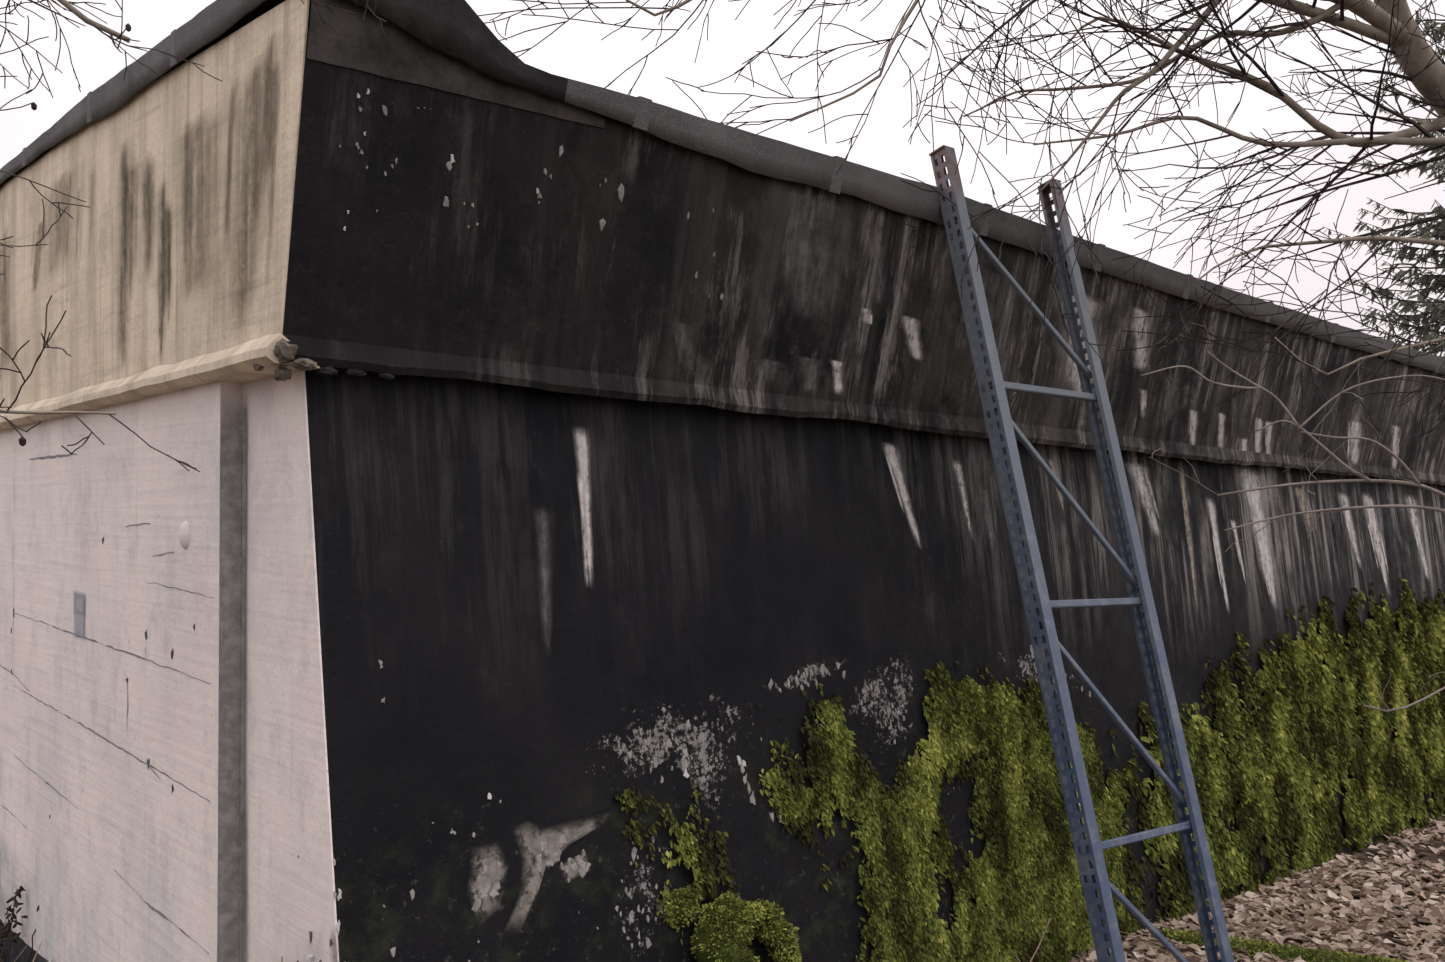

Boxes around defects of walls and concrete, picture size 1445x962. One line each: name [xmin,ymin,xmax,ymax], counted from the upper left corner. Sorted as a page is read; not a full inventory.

leakage [120,153,169,352]
leakage [1242,419,1272,454]
leakage [576,432,592,578]
leakage [885,445,919,542]
leakage [1208,500,1245,606]
leakage [1241,470,1276,602]
leakage [1328,493,1388,587]
crack [13,571,210,684]
crack [0,665,210,809]
spalling [450,828,506,913]
spalling [511,821,595,921]
peeling [297,920,340,962]